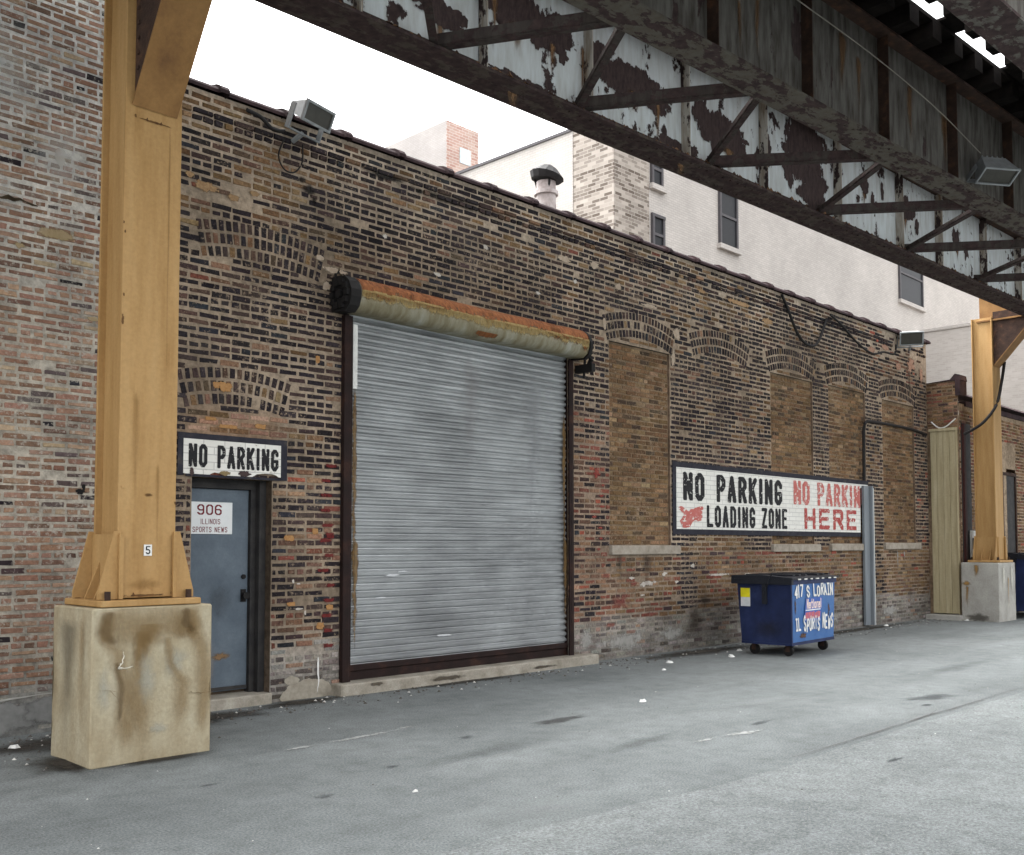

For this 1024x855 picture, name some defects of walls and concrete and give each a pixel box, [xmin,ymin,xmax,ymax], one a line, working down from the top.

peeling [412,0,468,31]
peeling [488,0,560,24]
peeling [488,63,554,92]
peeling [530,33,664,94]
peeling [647,104,672,117]
peeling [654,100,829,209]
peeling [856,179,884,203]
peeling [903,195,919,235]
peeling [952,227,969,261]
rust [356,278,590,351]